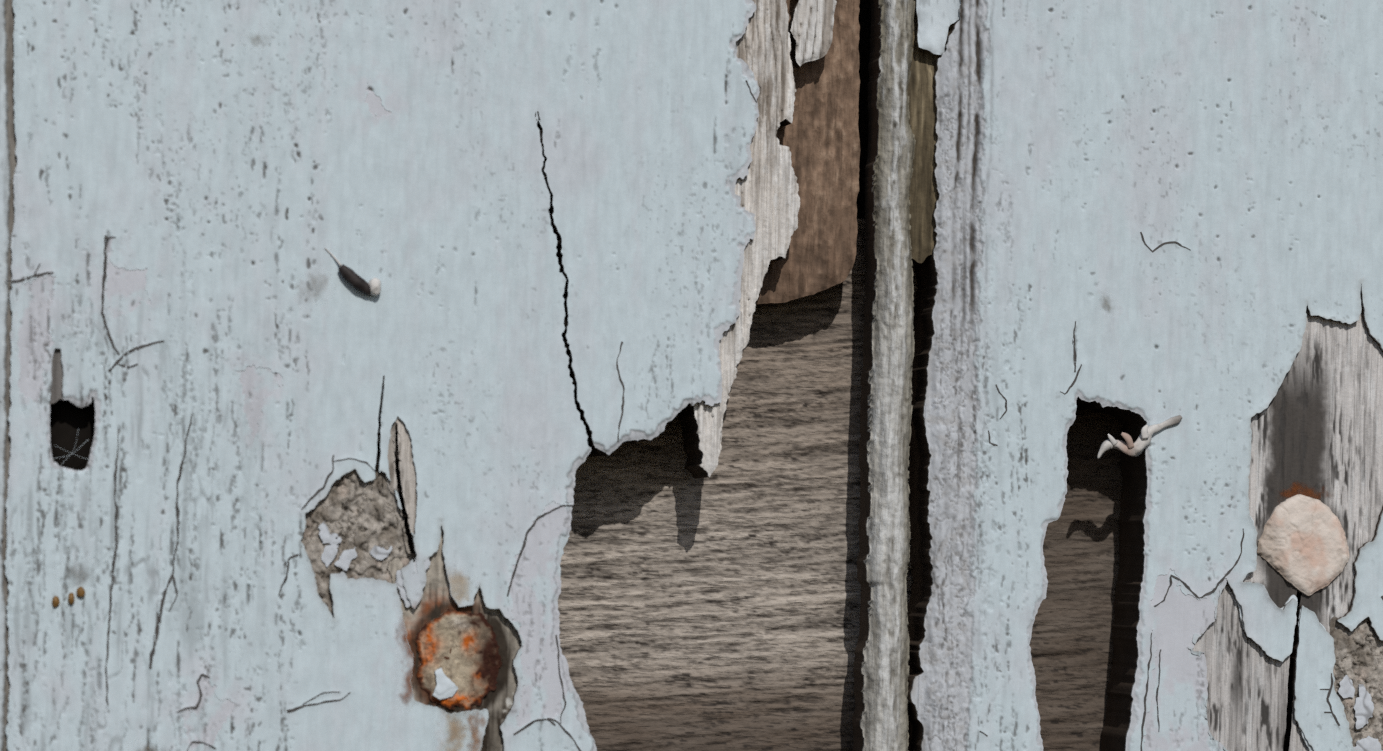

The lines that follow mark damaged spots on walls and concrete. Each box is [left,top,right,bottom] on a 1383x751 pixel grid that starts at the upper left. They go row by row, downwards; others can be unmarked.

crack [5,263,53,282]
crack [537,111,625,456]
peeling [1143,310,1383,751]
peeling [301,417,574,751]
crack [1295,591,1303,617]
corrosion [450,717,479,748]
crack [1283,657,1340,751]